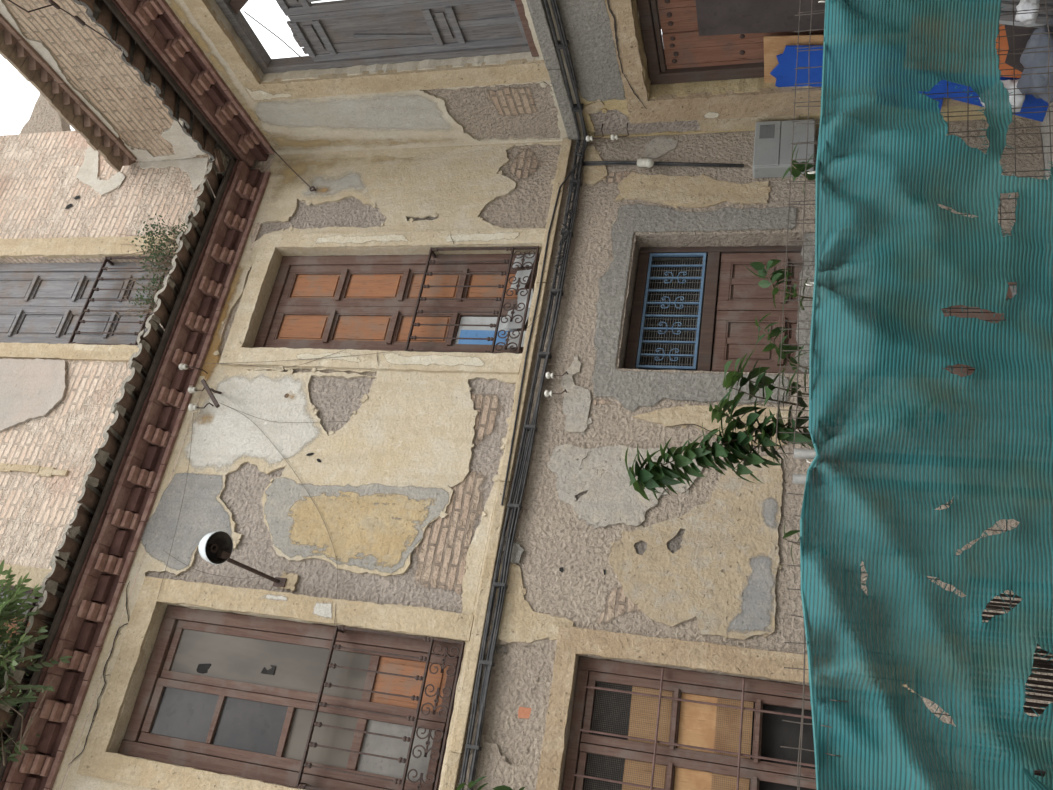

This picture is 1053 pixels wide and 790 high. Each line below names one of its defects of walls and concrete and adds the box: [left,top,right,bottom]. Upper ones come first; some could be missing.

crack [607,0,647,109]
spalling [421,81,561,242]
peeling [0,358,67,432]
spalling [213,297,242,363]
spalling [141,353,516,618]
peeling [547,355,789,640]
crack [71,581,130,763]
spalling [477,543,574,766]